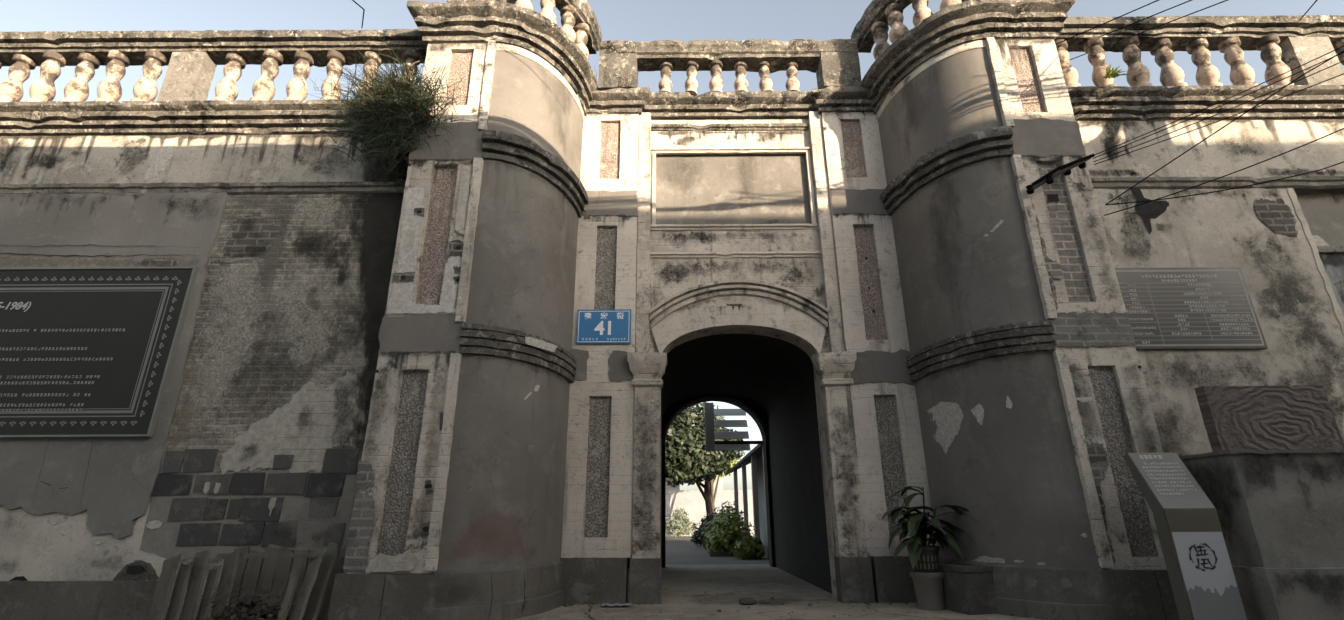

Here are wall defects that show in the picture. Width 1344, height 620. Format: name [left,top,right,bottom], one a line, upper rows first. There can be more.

damp [0,135,107,179]
damp [1021,119,1286,259]
flaking render [1254,198,1329,246]
damp [1265,168,1344,196]
flaking render [0,194,375,581]
damp [125,133,473,452]
peeling [927,402,984,454]
damp [1138,400,1344,530]
damp [1257,242,1344,416]